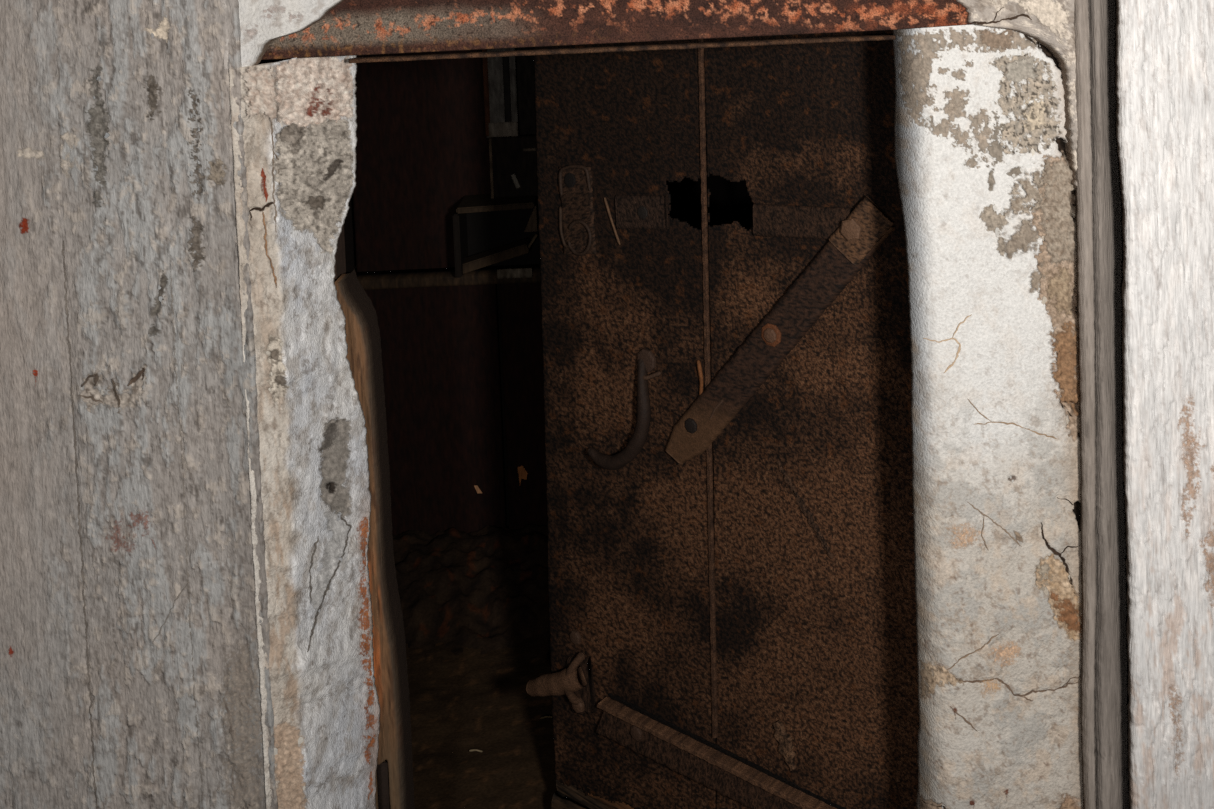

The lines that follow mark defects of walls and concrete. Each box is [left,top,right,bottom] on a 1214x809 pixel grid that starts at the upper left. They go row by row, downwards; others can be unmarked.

flaking render [897,27,1080,442]
crack [968,497,1081,596]
crack [920,634,1080,732]